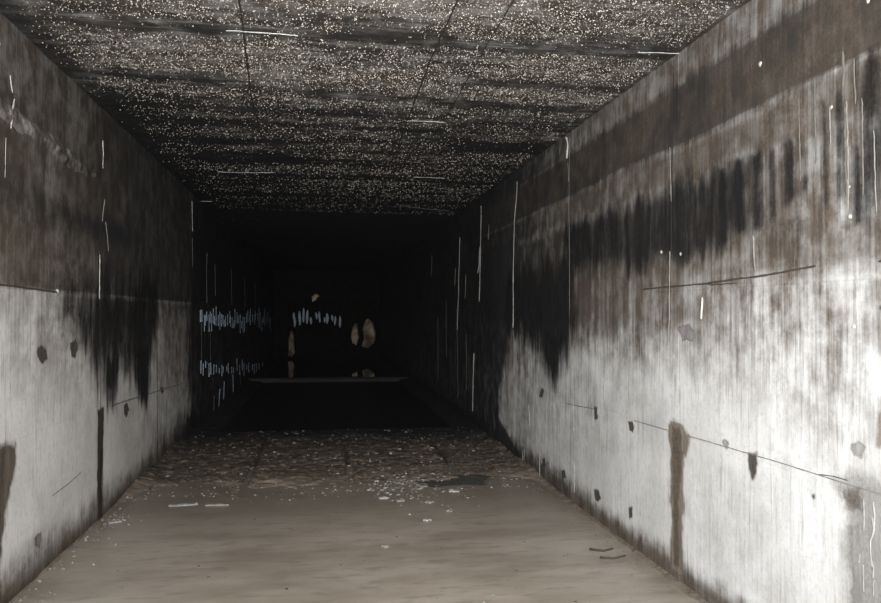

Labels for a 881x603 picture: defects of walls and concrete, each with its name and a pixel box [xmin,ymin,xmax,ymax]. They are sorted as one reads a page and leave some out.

damp [785,99,806,201]
damp [814,52,877,221]
damp [752,152,775,272]
damp [660,250,681,345]
damp [122,341,151,407]
damp [0,443,16,557]
damp [668,422,689,576]